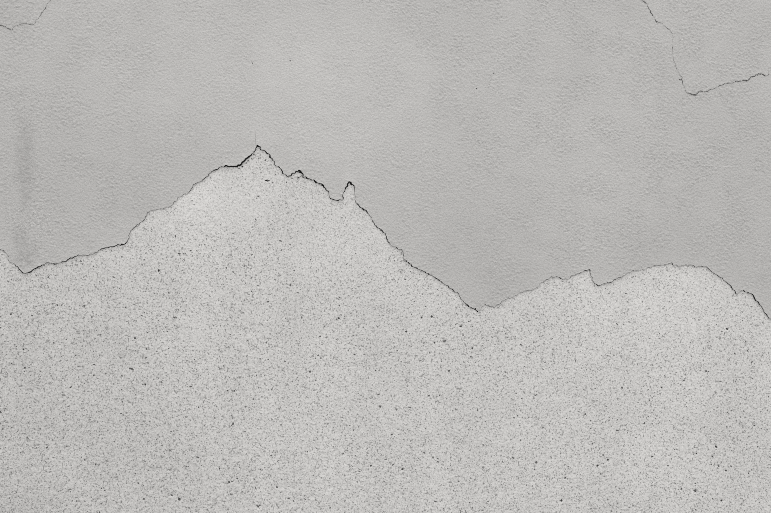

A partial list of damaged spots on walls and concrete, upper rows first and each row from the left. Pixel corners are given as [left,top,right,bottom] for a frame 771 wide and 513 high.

crack [643,1,769,95]
peeling [0,145,771,513]